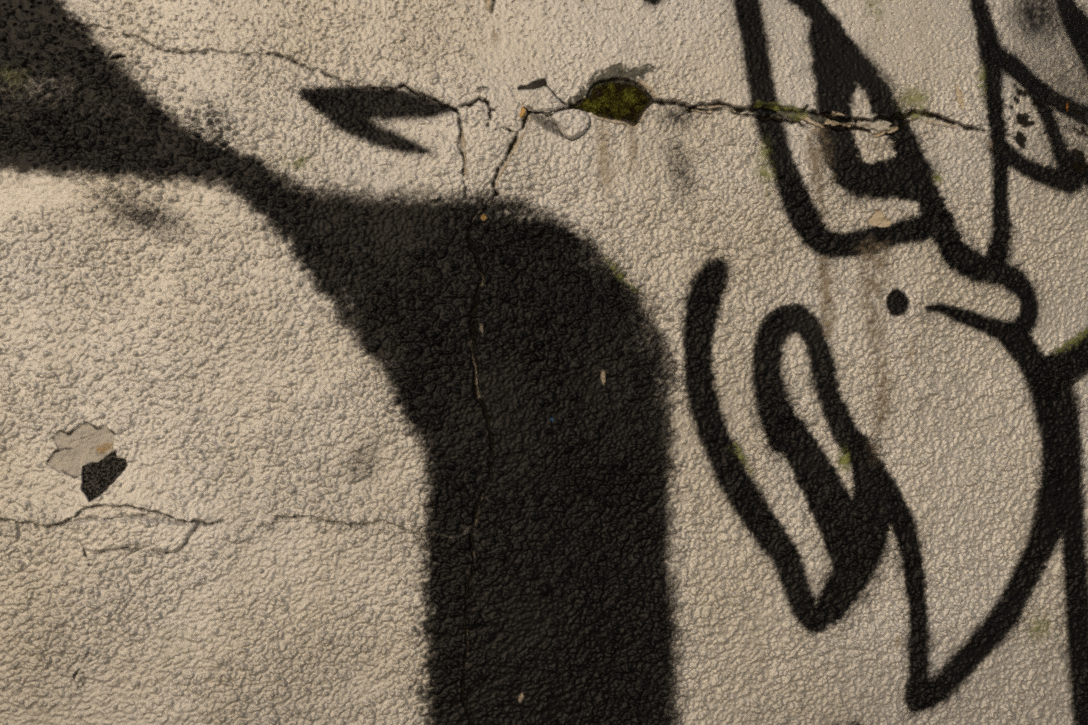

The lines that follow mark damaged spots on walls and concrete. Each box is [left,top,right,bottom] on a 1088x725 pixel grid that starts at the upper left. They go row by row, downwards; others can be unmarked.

crack [485,0,495,13]
spalling [518,63,658,129]
crack [652,99,1014,138]
crack [65,19,548,725]
spalling [46,422,127,502]